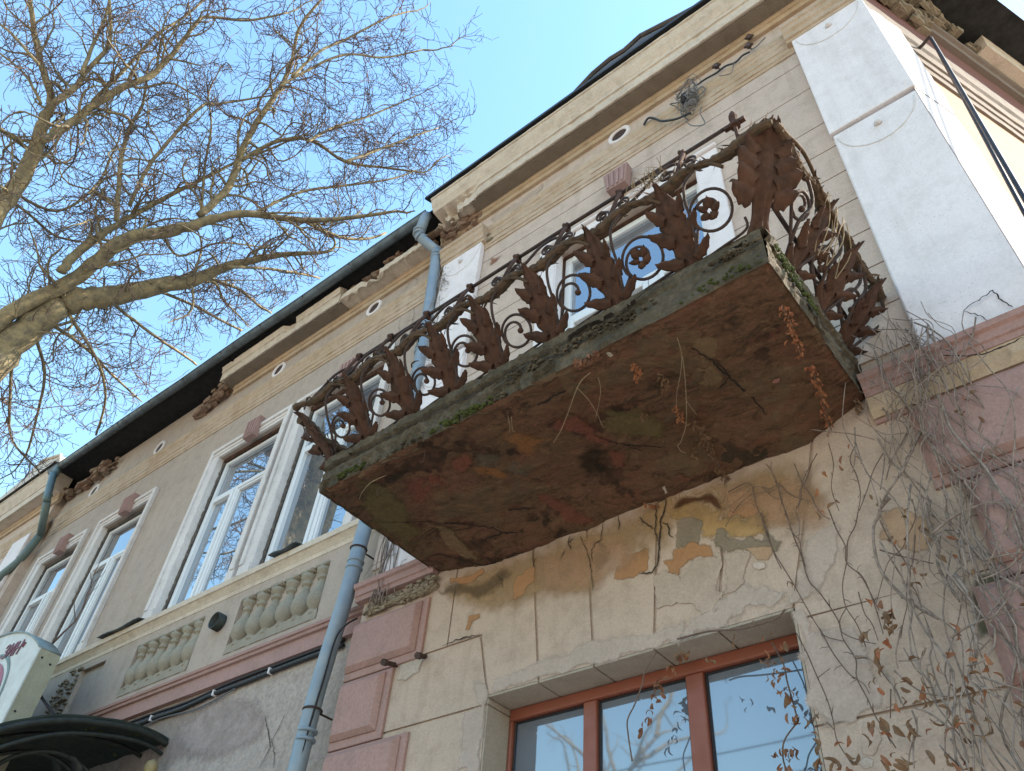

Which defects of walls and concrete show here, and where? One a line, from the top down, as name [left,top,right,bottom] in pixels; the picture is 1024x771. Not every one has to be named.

crack [964,290,1012,320]
crack [691,348,766,415]
crack [381,498,674,588]
peeling [458,494,896,771]